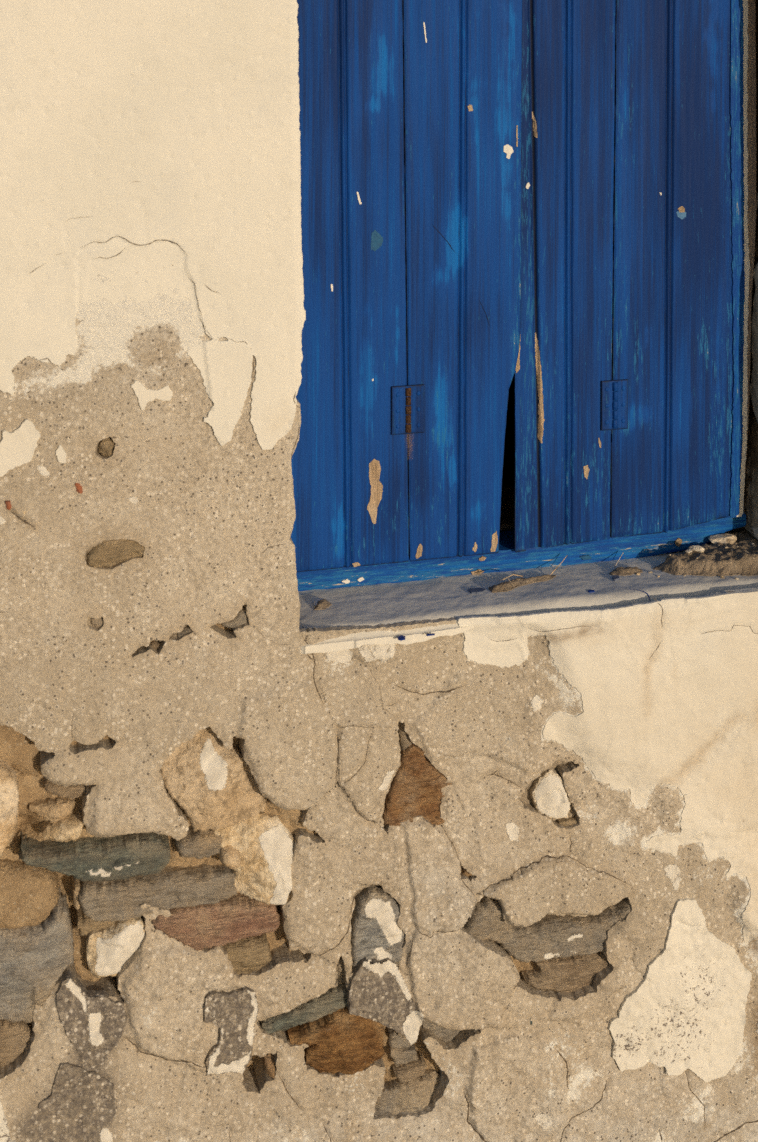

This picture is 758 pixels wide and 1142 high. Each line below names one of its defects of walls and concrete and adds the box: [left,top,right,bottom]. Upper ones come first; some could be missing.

peeling [0,236,758,1142]
crack [336,672,463,825]
crack [444,830,629,893]
crack [464,1092,486,1142]
crack [685,1070,758,1142]